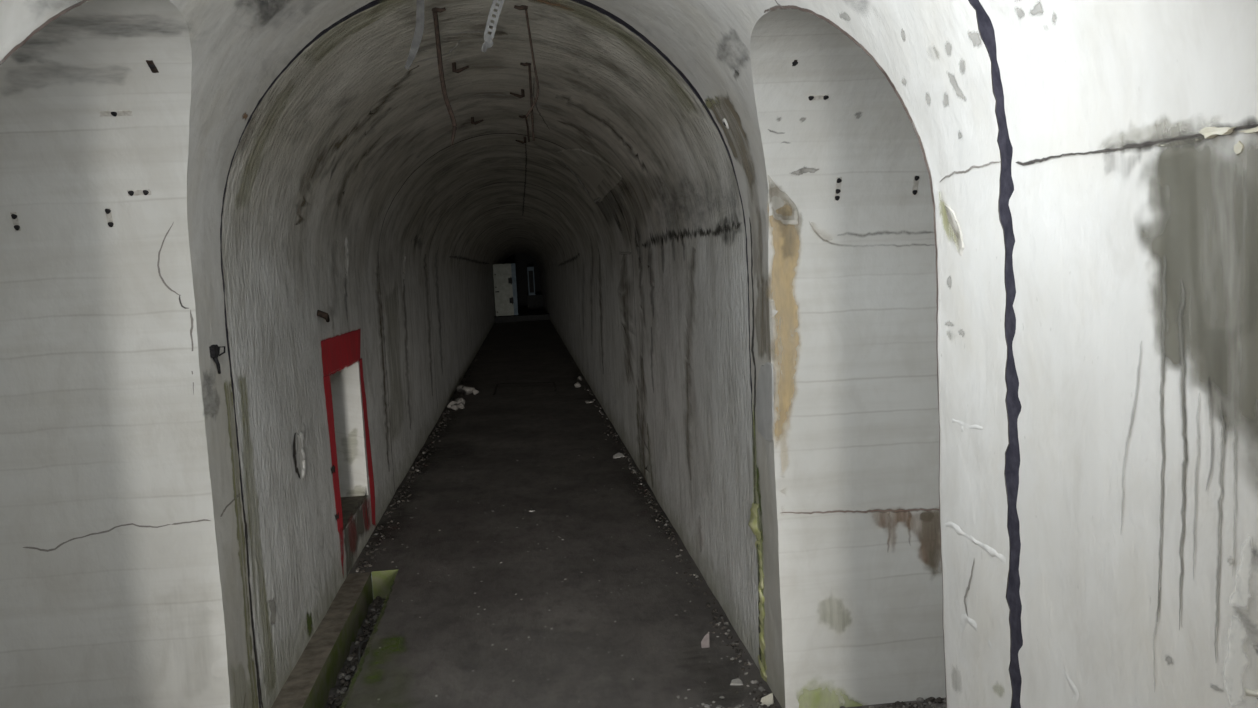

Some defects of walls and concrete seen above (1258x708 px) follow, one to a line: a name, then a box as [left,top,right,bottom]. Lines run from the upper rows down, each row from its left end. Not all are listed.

peeling [927,44,965,105]
peeling [968,32,981,46]
peeling [1016,2,1056,23]
crack [940,119,1258,182]
water stain [764,5,940,473]
water stain [760,280,769,356]
water stain [1140,137,1258,657]
crack [23,494,263,708]
water stain [748,466,767,682]
rust [782,508,939,574]